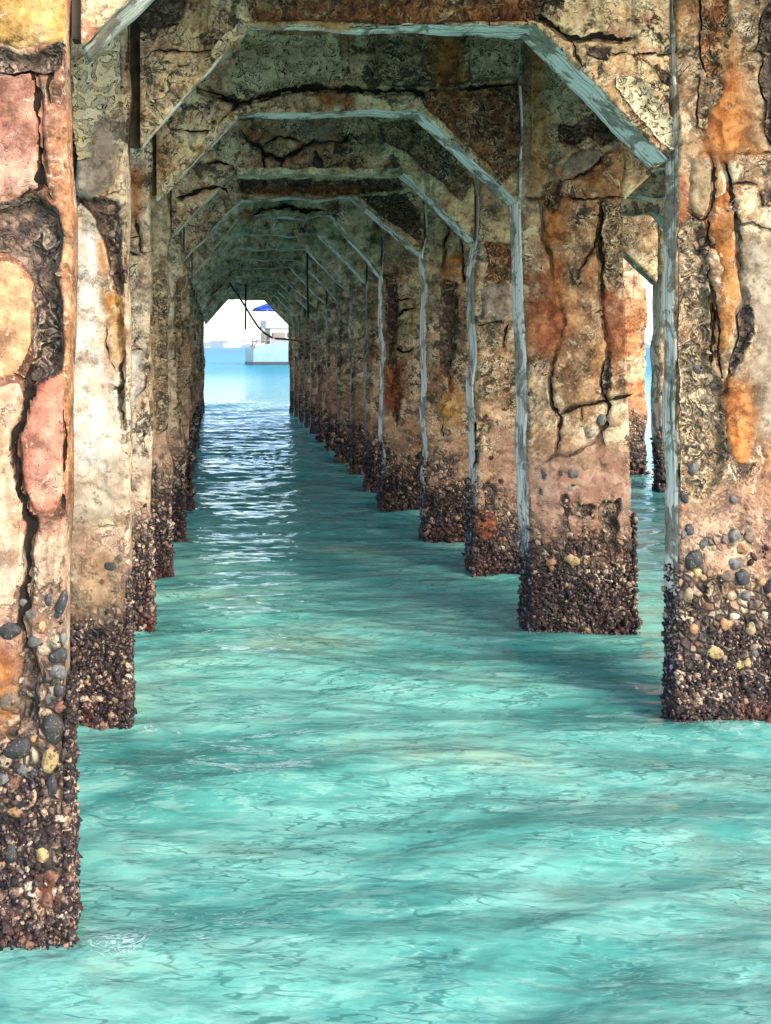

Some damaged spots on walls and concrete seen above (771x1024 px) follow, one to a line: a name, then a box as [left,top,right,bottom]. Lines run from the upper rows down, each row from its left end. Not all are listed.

crack [172,83,518,168]
rust [708,45,760,153]
rust [529,199,567,354]
crack [525,157,634,472]
crack [687,151,771,452]
rust [384,362,407,416]
rust [727,382,755,462]